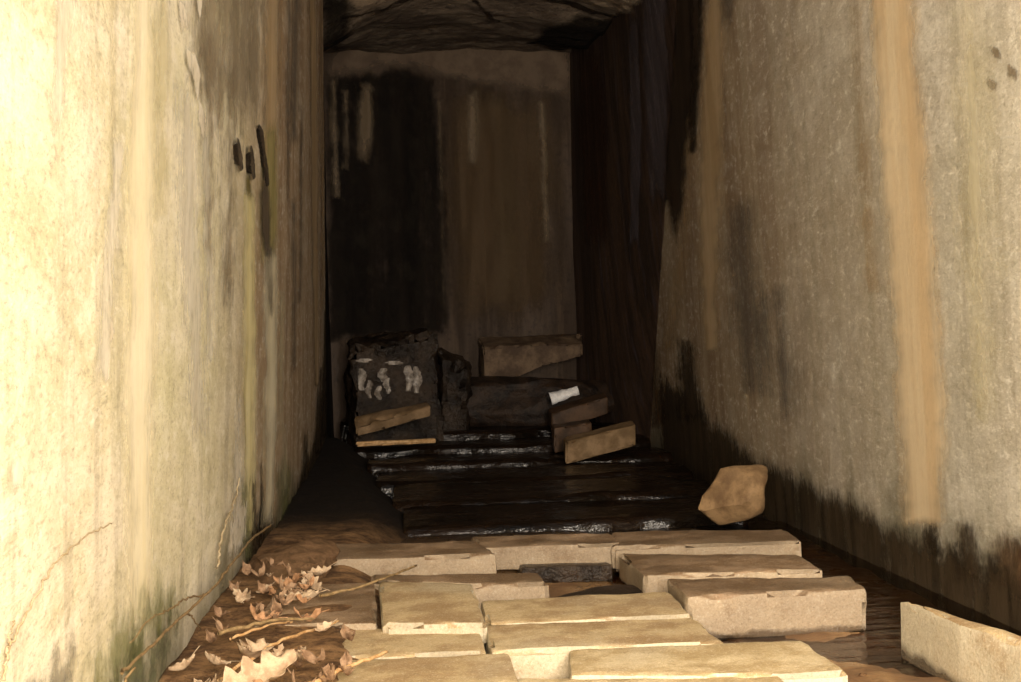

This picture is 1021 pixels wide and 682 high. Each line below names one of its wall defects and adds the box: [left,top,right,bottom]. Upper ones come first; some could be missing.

water stain [175,0,267,427]
water stain [650,340,1021,632]
water stain [52,646,76,682]